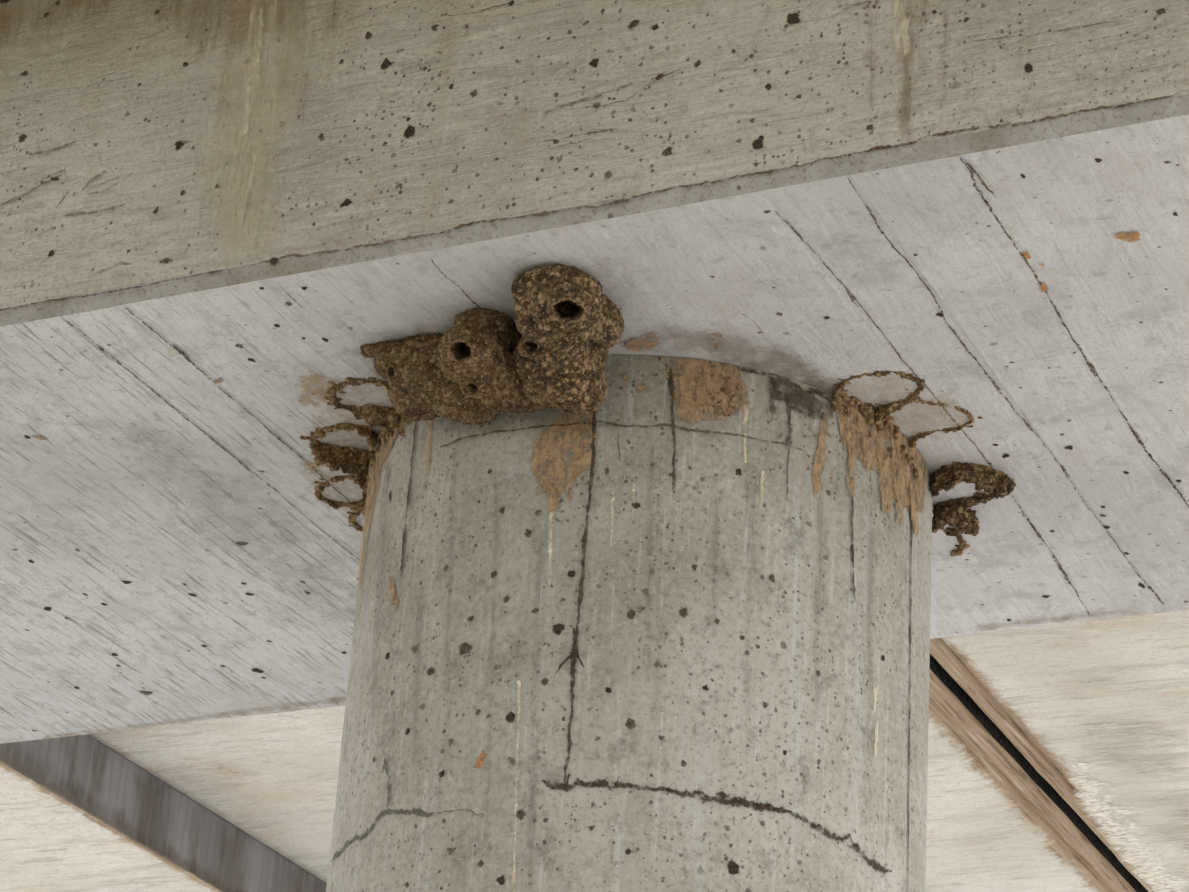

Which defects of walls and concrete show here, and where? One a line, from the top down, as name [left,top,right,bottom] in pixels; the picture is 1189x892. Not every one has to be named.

leakage [894,0,910,55]
crack [0,93,1189,615]
crack [331,758,479,862]
crack [400,356,913,874]